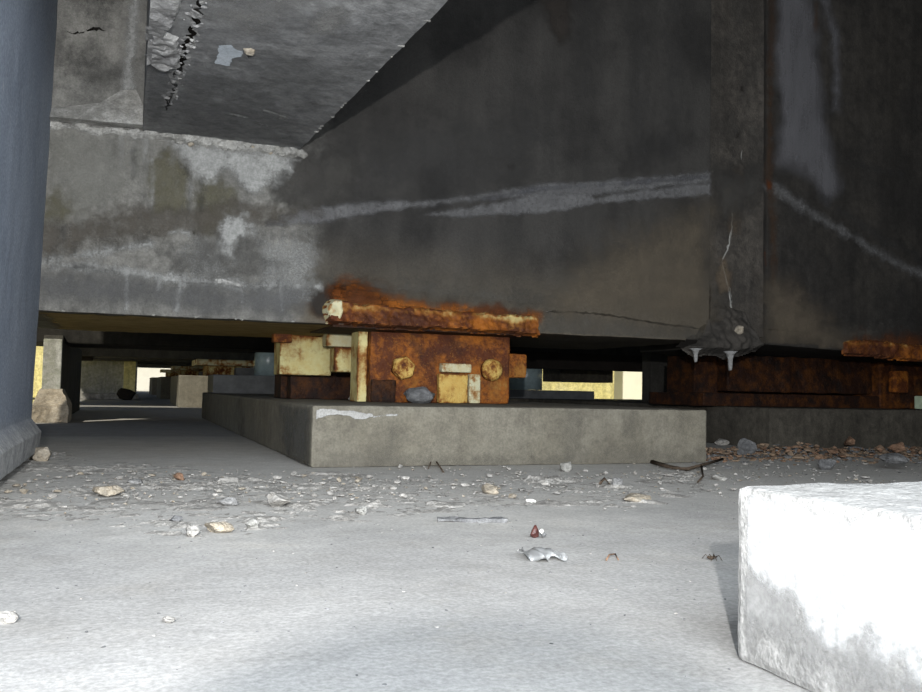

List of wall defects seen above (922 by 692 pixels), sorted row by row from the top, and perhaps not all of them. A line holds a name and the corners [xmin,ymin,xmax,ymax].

crack [67,26,105,34]
spalling [144,0,182,72]
water stain [775,0,837,202]
water stain [41,138,710,338]
corrosion [326,279,543,321]
water stain [546,304,764,370]
crack [716,213,736,308]
water stain [764,181,922,277]